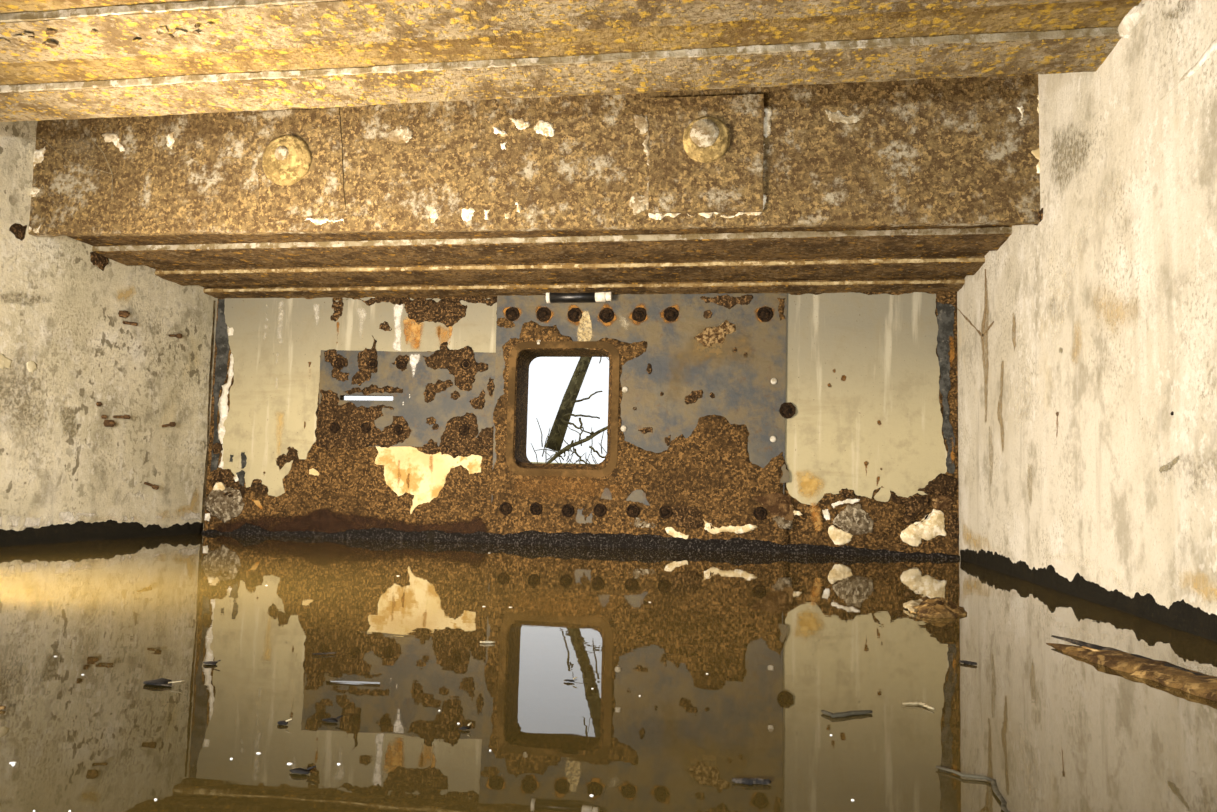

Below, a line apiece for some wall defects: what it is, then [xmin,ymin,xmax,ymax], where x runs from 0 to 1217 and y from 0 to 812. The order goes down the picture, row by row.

rust [9,223,27,241]
peeling [204,297,497,523]
rust [304,294,788,545]
peeling [753,292,954,546]
rust [210,442,298,509]
peeling [576,508,593,524]
peeling [601,488,650,506]
spalling [630,505,757,539]
rust [798,473,821,530]
rust [839,442,959,539]